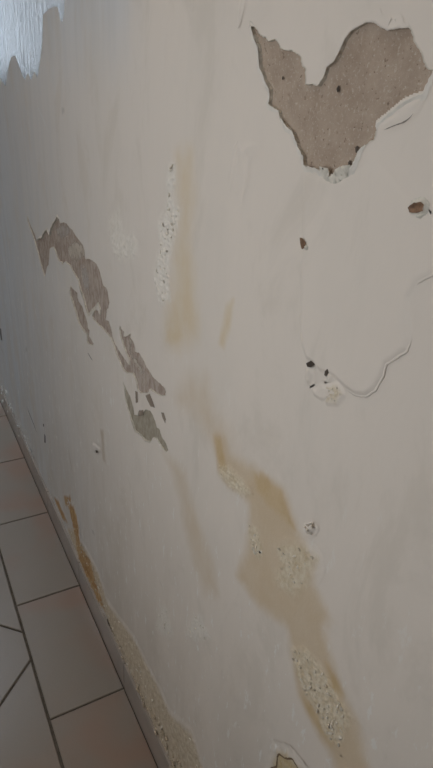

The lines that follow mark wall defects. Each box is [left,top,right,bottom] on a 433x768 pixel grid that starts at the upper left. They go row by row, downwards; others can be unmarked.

peeling [249,8,433,184]
peeling [27,214,169,453]
leakage [151,121,380,768]